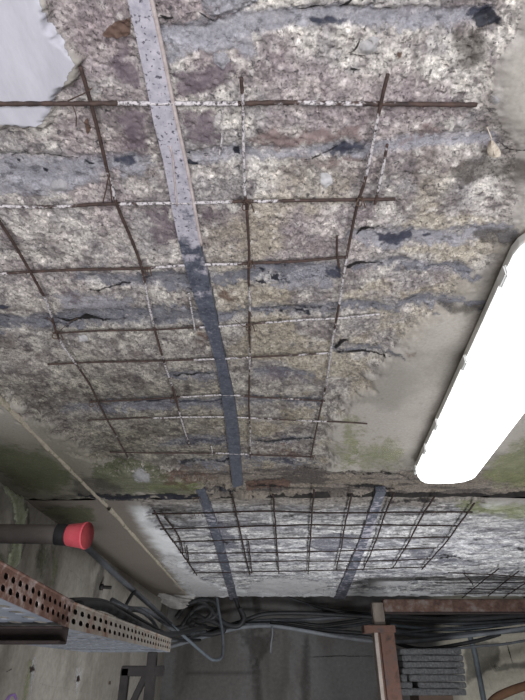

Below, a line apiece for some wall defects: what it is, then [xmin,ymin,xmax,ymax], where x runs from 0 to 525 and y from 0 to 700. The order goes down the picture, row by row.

corrosion [174,63,236,97]
corrosion [183,111,221,145]
corrosion [259,126,358,147]
corrosion [148,208,178,243]
spalling [0,0,524,460]
crack [346,260,383,268]
crack [55,314,126,325]
crack [335,339,386,358]
spalling [0,273,525,609]